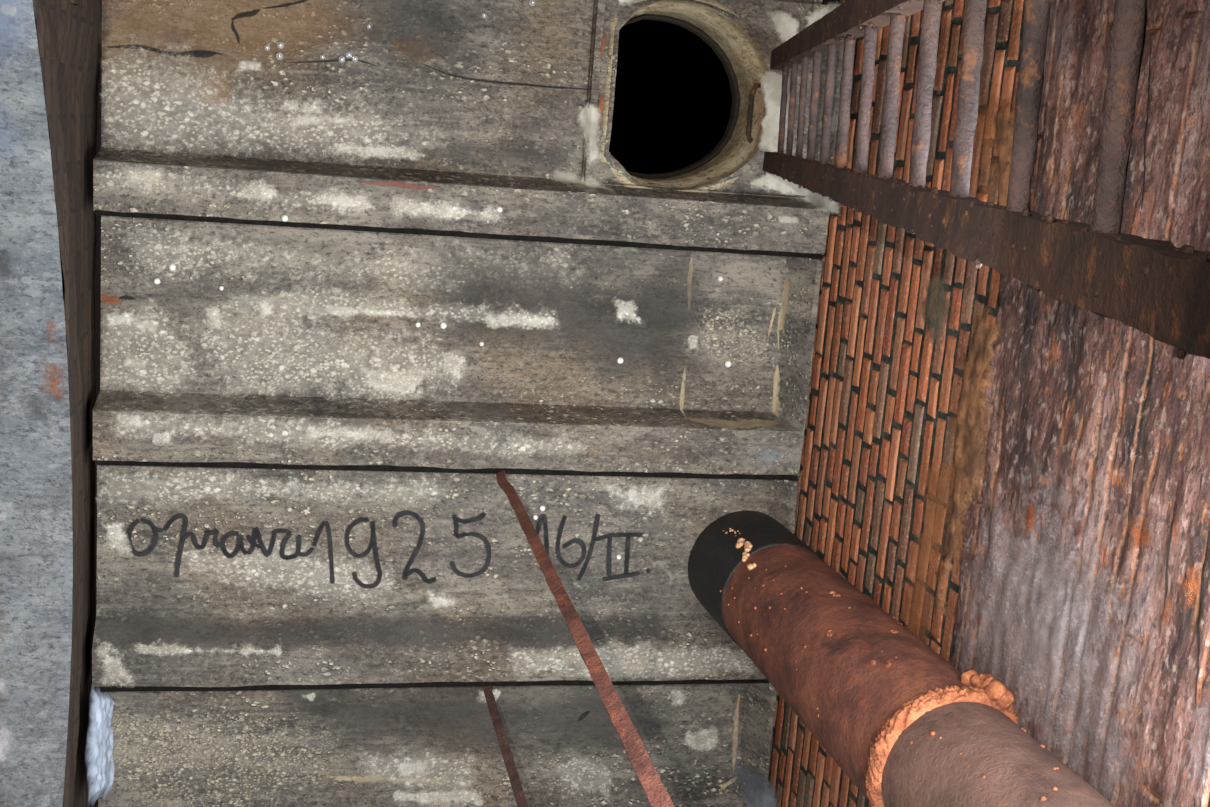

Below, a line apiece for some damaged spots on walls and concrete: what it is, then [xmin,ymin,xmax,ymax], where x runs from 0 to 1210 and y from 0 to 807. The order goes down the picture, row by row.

crack [108,0,307,58]
damp [979,100,1015,206]
damp [905,304,1142,798]
crack [1162,476,1179,619]
crack [1195,523,1210,708]